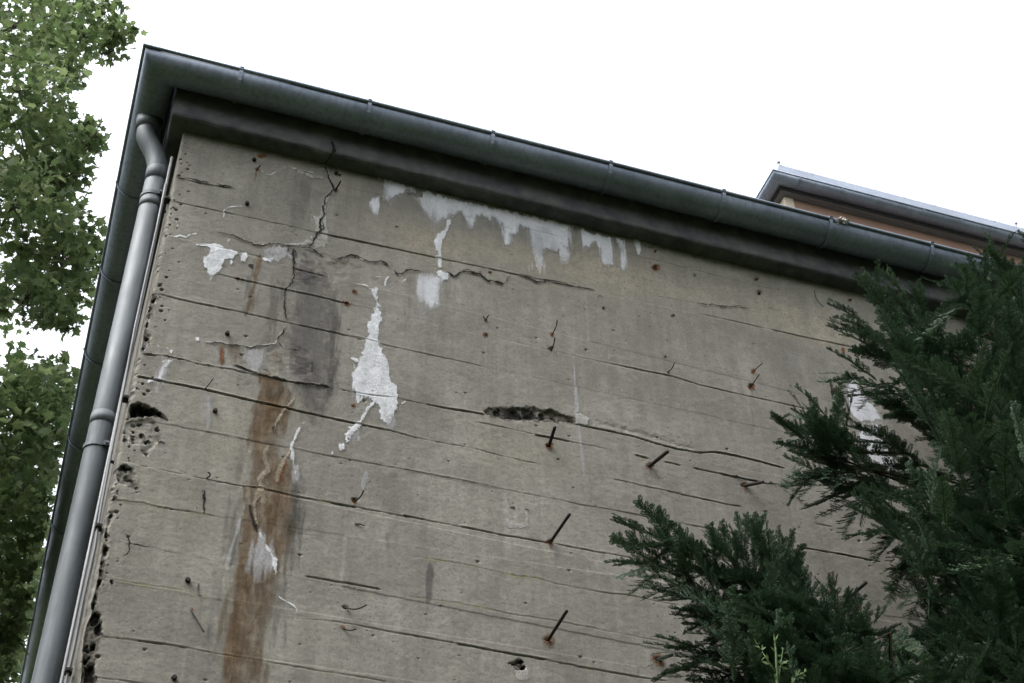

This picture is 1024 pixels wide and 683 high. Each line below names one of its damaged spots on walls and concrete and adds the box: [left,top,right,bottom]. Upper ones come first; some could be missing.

crack [143,142,422,405]
crack [447,269,604,298]
spalling [123,401,168,445]
spalling [484,405,576,424]
crack [249,504,257,532]
rust [224,375,293,683]
spalling [80,465,138,683]